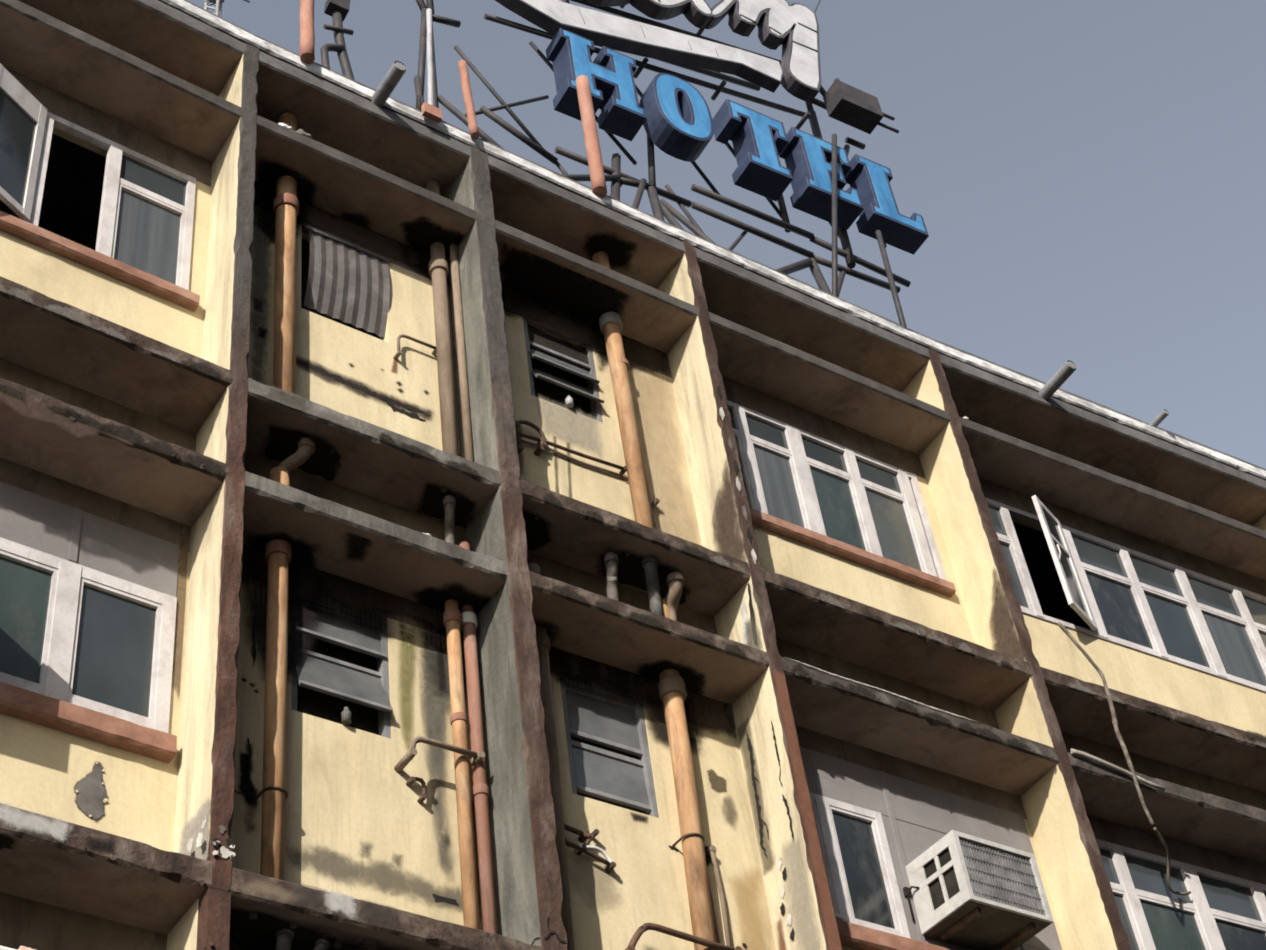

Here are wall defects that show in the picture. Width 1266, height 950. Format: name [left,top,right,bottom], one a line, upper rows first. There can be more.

leakage [251,210,270,380]
spalling [0,805,68,849]
peeling [74,762,108,822]
spalling [85,837,117,861]
leakage [235,738,258,830]
leakage [291,845,463,926]
leakage [400,623,451,870]